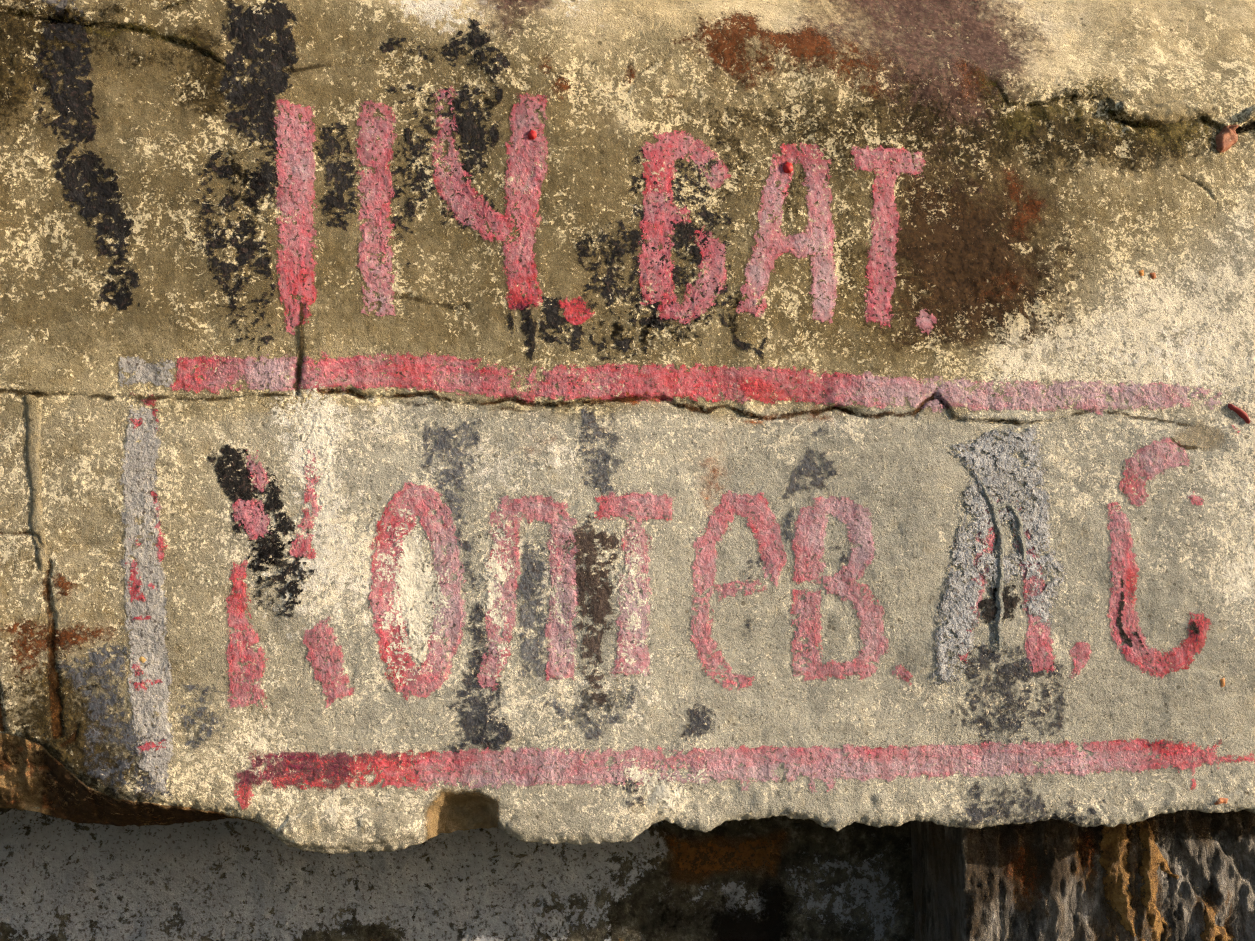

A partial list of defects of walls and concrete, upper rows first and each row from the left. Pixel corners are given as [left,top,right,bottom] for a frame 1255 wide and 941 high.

crack [282,63,333,72]
rust [674,11,902,98]
crack [988,81,1255,134]
crack [0,302,1199,450]
crack [42,560,77,746]
crack [0,697,8,732]
peeling [0,733,673,941]